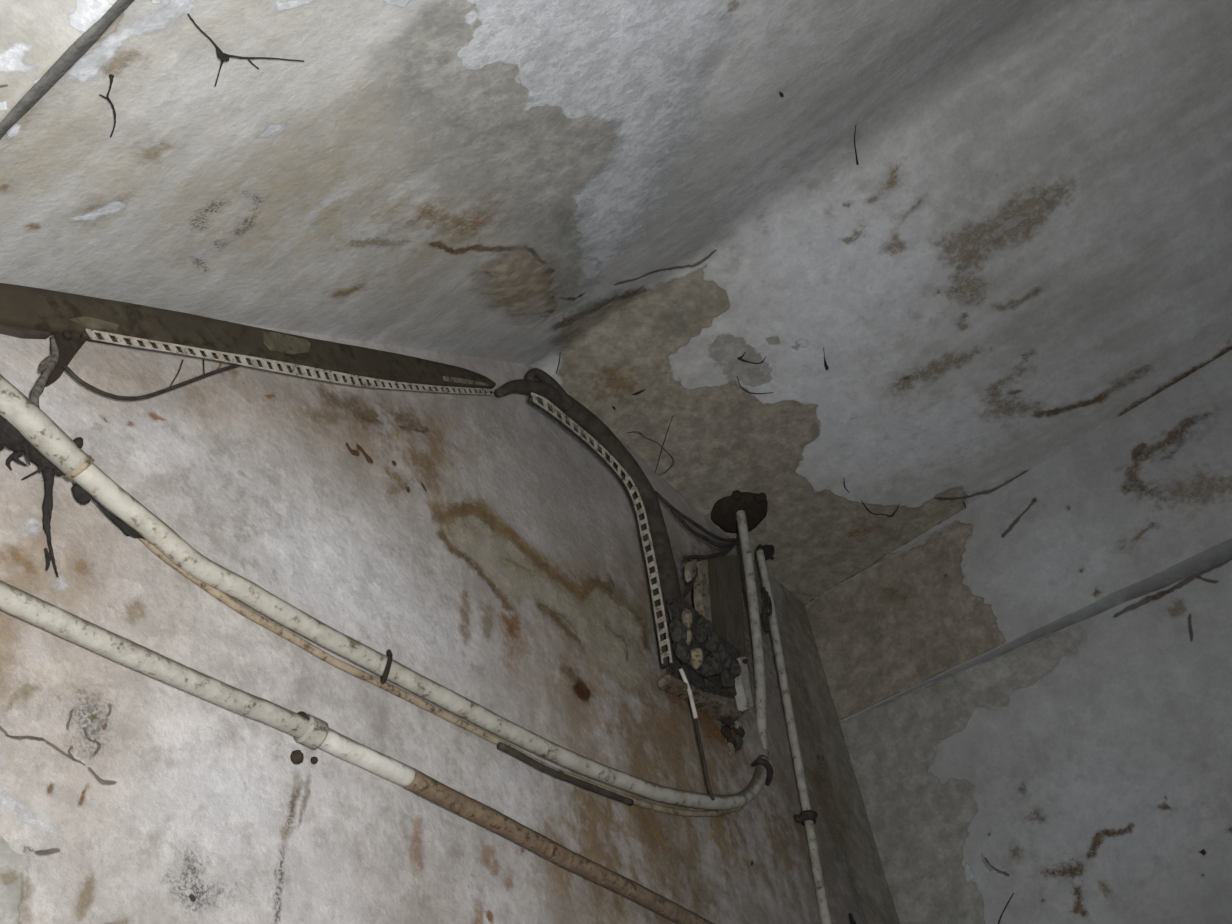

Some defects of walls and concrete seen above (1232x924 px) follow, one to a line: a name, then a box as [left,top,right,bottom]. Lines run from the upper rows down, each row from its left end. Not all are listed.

peeling [0,43,40,84]
peeling [68,0,194,82]
peeling [6,124,21,137]
peeling [389,0,733,284]
peeling [72,201,126,221]
crack [430,241,547,265]
peeling [989,368,1150,417]
leakage [1123,414,1207,495]
leakage [431,500,649,691]
peeling [553,268,1084,924]
rust [561,668,590,701]
crack [0,726,116,785]